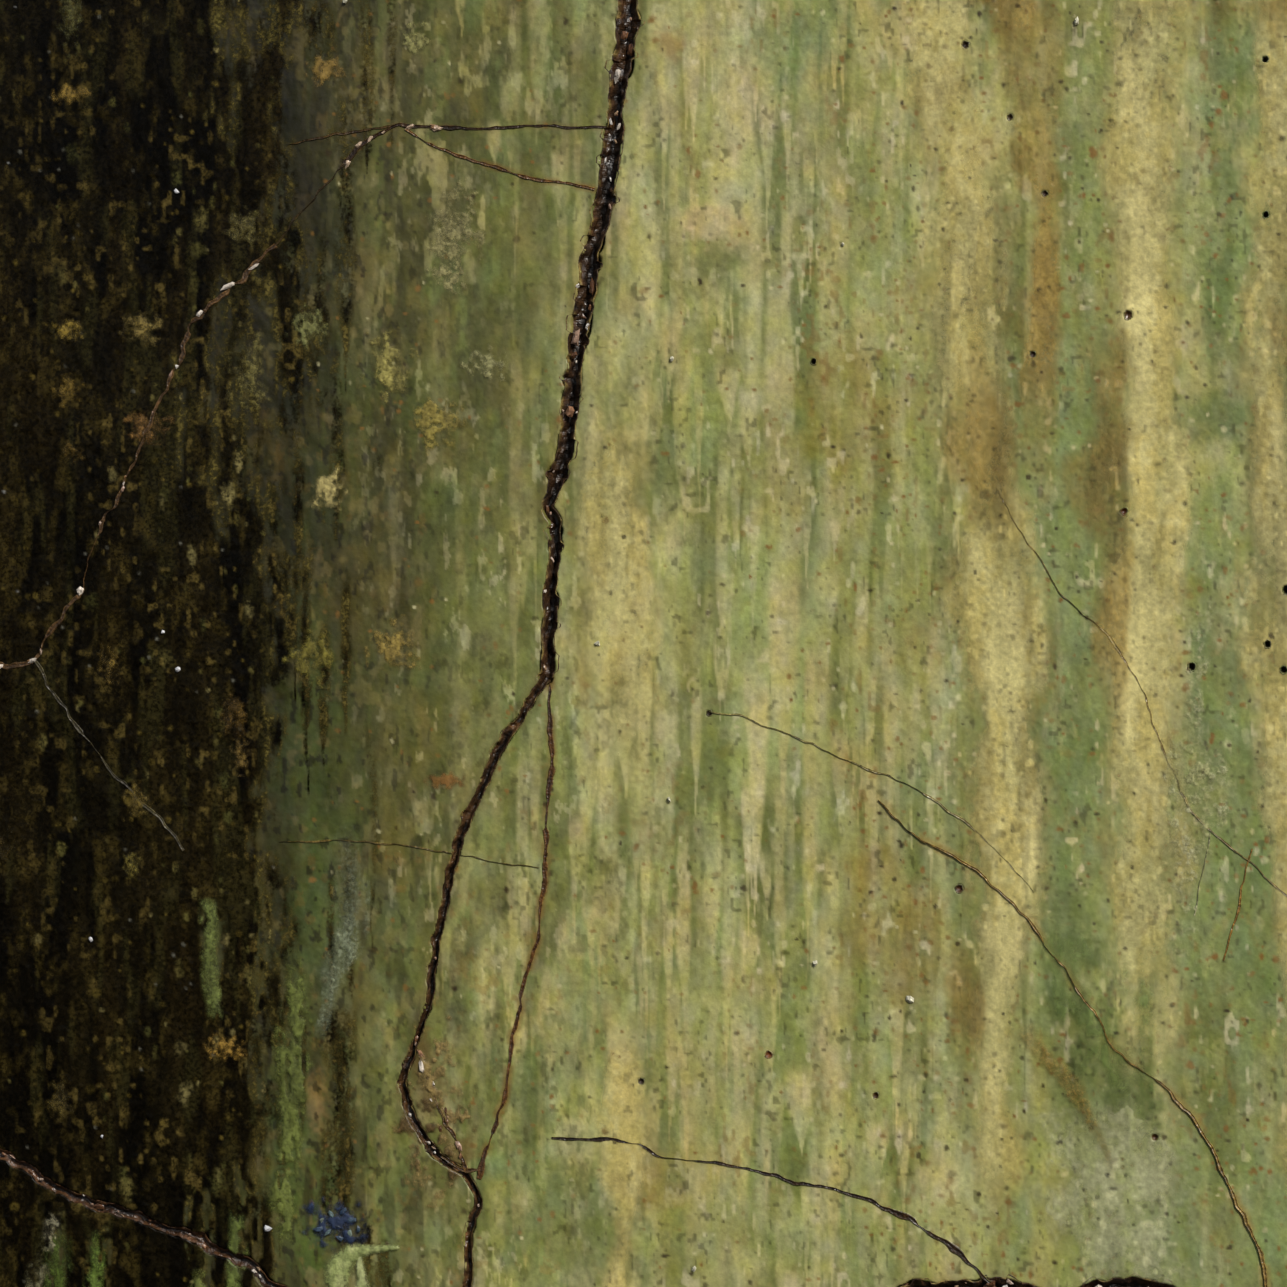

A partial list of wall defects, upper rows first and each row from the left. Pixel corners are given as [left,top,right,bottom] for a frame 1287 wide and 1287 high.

water stain [0,0,396,1287]
crack [0,0,646,1287]
crack [552,1136,1037,1287]
crack [709,711,1268,1287]
crack [998,490,1287,960]